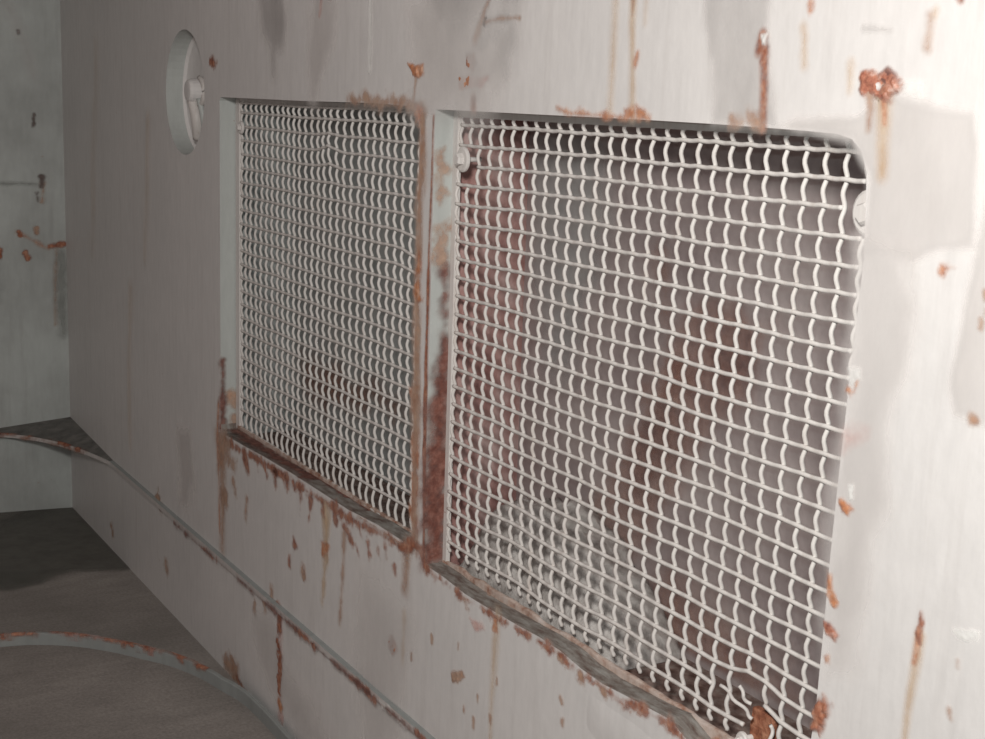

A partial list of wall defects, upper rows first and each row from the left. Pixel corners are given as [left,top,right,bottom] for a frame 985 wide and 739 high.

corrosion [602,0,649,120]
corrosion [730,30,768,131]
corrosion [859,67,901,177]
corrosion [216,91,456,596]
water stain [0,507,129,588]
corrosion [482,607,612,697]
corrosion [622,700,683,739]
corrosion [810,697,828,733]